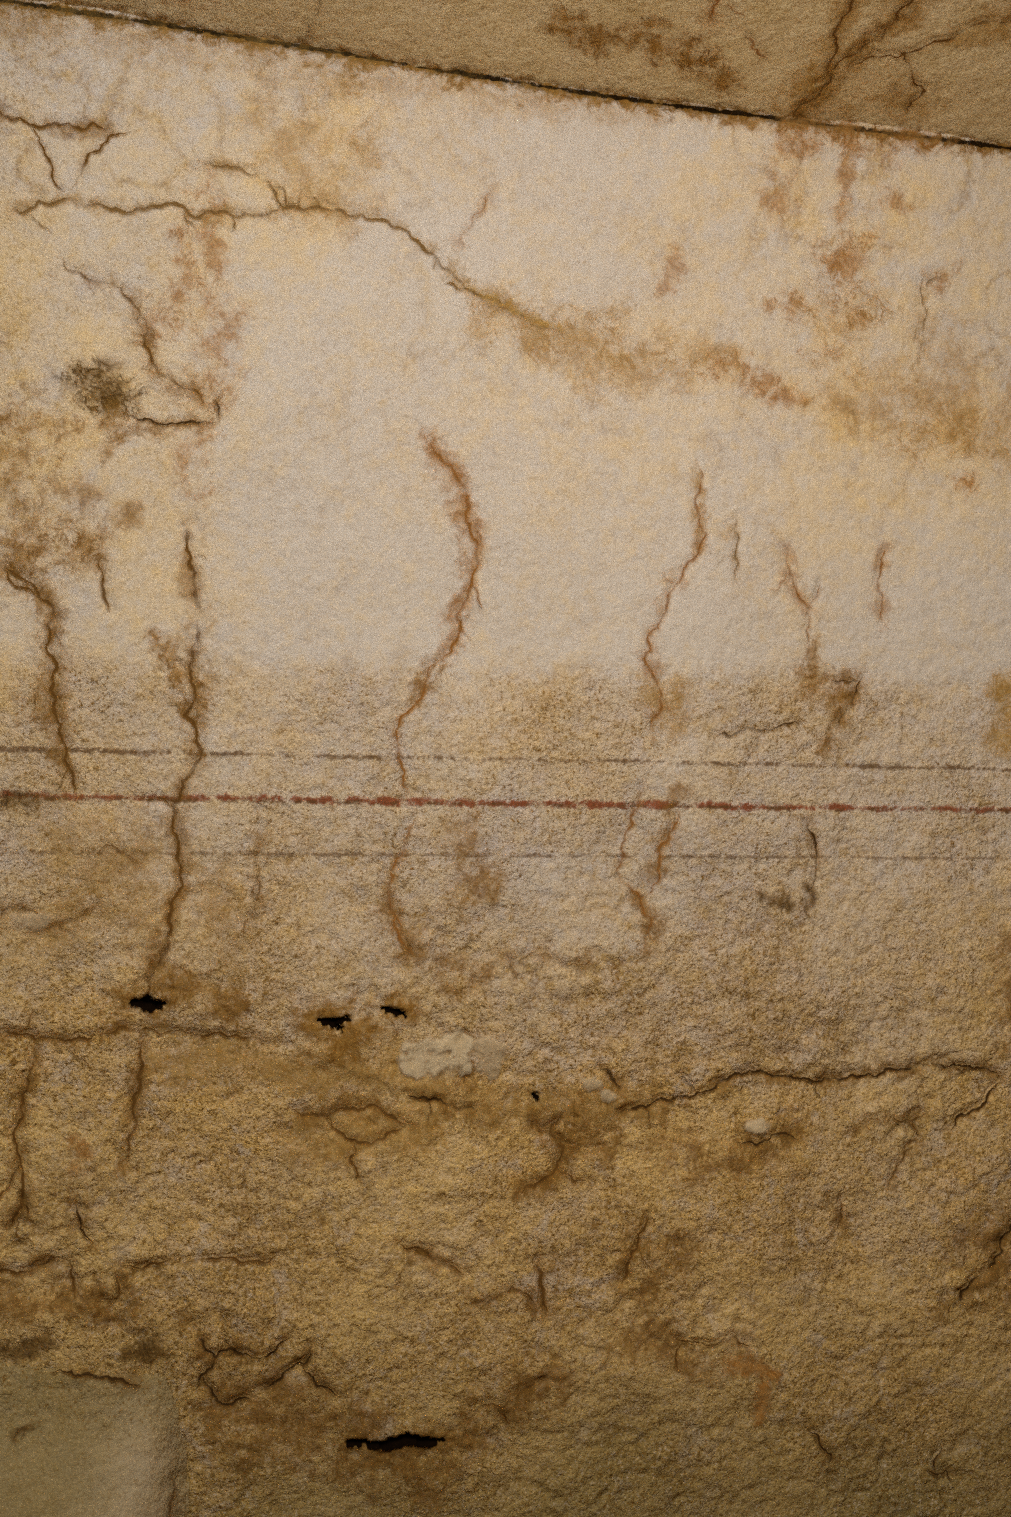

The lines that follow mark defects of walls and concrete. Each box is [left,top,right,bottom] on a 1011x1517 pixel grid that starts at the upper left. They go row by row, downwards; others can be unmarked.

crack [0,0,1011,158]
crack [0,111,546,426]
leakage [0,539,44,574]
crack [98,561,110,612]
crack [185,531,197,596]
crack [643,467,740,729]
crack [3,567,76,790]
crack [388,434,482,955]
leakage [983,672,1011,757]
crack [616,801,680,940]
crack [0,632,288,1300]
crack [601,1063,1001,1184]